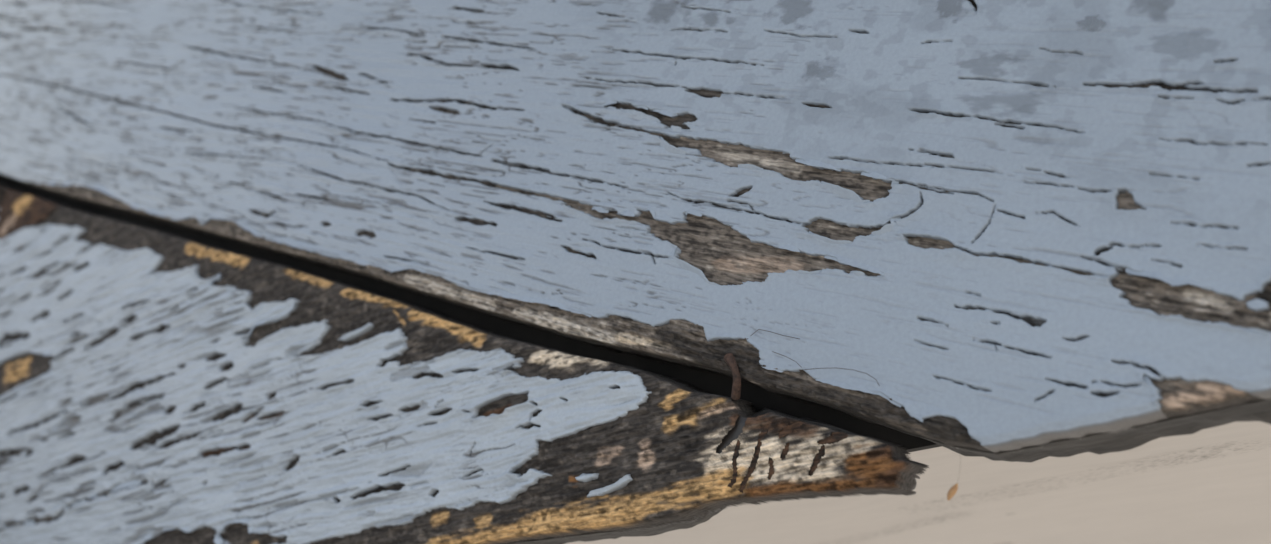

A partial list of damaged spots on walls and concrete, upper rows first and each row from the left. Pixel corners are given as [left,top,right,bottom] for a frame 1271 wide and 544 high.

crack [370,8,530,70]
crack [916,111,1076,132]
crack [1085,83,1271,105]
crack [0,46,664,260]
peeling [565,100,949,203]
peeling [495,184,914,285]
crack [671,194,810,225]
crack [839,152,1025,232]
peeling [907,237,1093,275]
peeling [0,352,54,401]
peeling [476,393,528,419]
peeling [1115,362,1264,419]